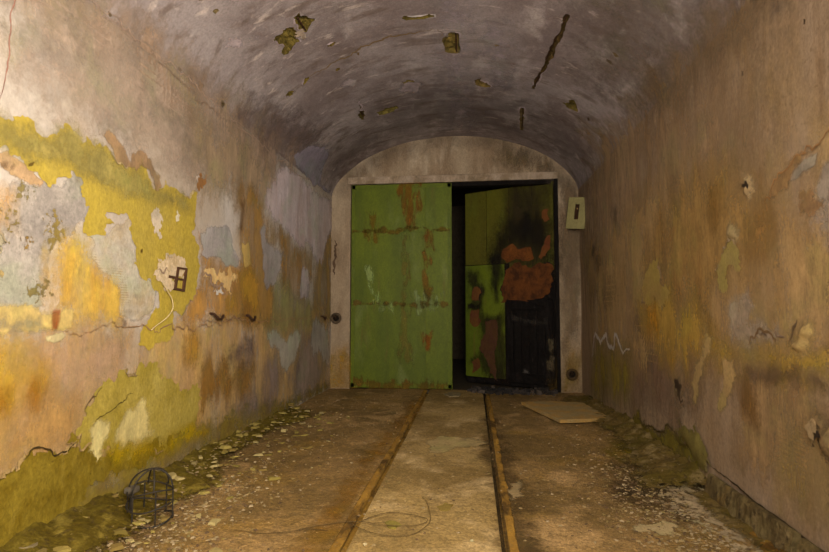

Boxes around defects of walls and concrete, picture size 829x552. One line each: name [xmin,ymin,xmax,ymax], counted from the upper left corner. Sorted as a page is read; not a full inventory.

crack [0,0,16,98]
spalling [273,12,315,55]
spalling [442,32,461,53]
peeling [0,115,239,351]
water stain [4,0,351,438]
corrosion [352,183,449,308]
water stain [578,0,829,481]
peeling [768,153,829,200]
water stain [0,237,130,475]
peeling [55,361,203,467]
water stain [609,458,705,521]
crack [711,466,806,539]